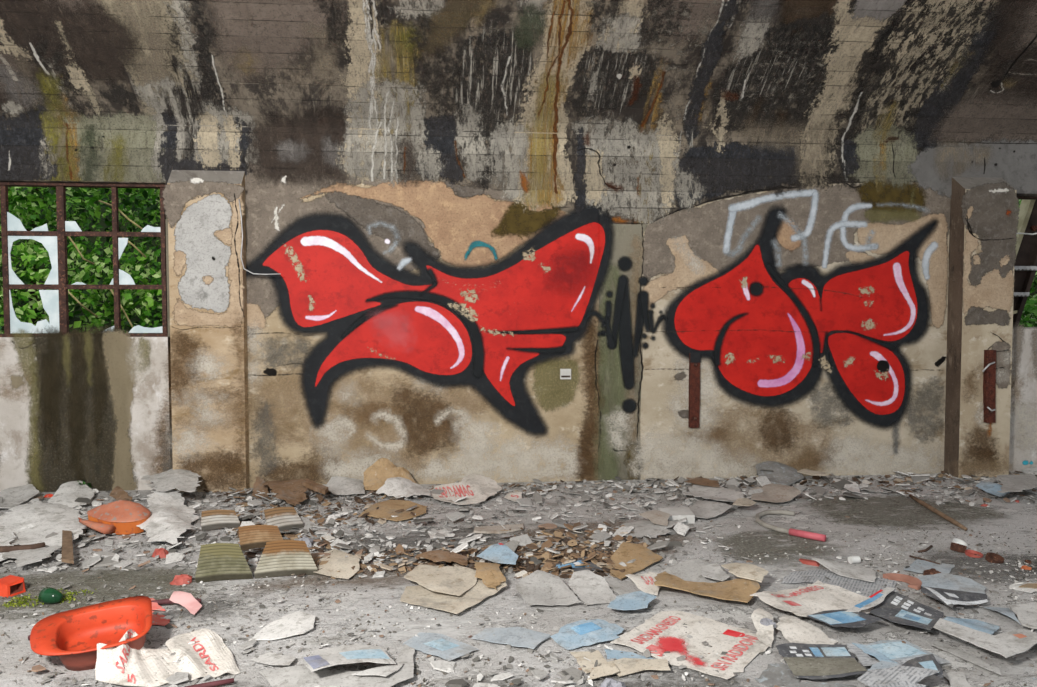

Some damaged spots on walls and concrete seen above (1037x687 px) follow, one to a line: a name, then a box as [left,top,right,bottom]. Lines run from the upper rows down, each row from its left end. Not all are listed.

leakage [0,0,1037,224]
corrosion [520,0,593,208]
crack [994,35,1037,88]
peeling [162,162,566,338]
peeling [642,182,1020,331]
leakage [6,324,151,492]
leakage [155,317,943,490]
peeling [801,352,854,373]
leakage [958,407,1012,475]
leakage [1010,326,1037,449]